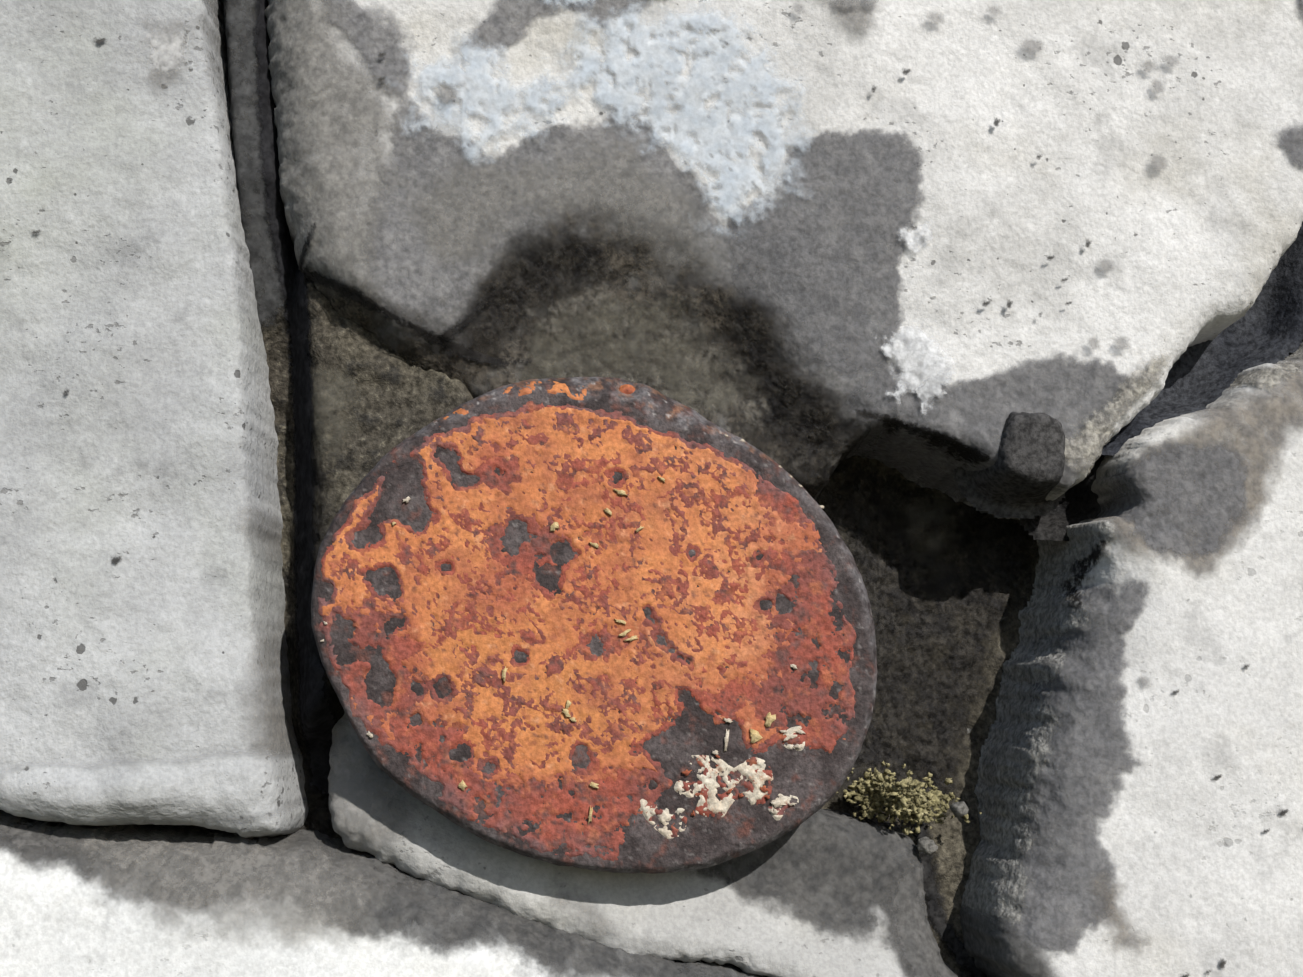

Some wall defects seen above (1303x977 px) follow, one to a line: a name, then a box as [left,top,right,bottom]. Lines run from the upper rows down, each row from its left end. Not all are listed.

rust [619,384,635,394]
damp [322,0,1148,977]
damp [1085,357,1303,574]
damp [0,636,424,930]